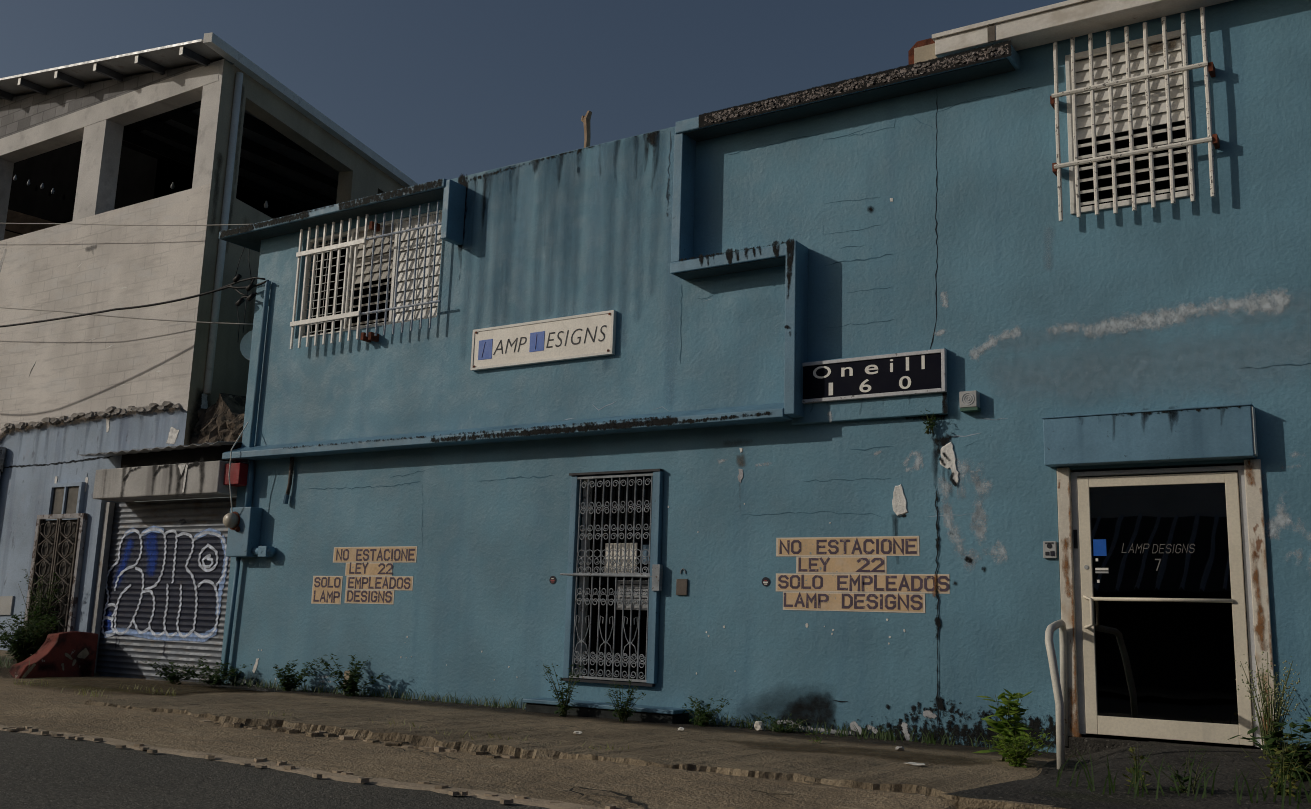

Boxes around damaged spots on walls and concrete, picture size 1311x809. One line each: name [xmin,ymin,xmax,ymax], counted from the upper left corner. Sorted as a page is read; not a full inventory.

leakage [458,131,672,249]
leakage [678,239,794,296]
crack [729,87,1030,349]
leakage [1054,292,1288,333]
peeling [892,484,908,536]
peeling [905,434,1005,572]
crack [778,486,983,763]